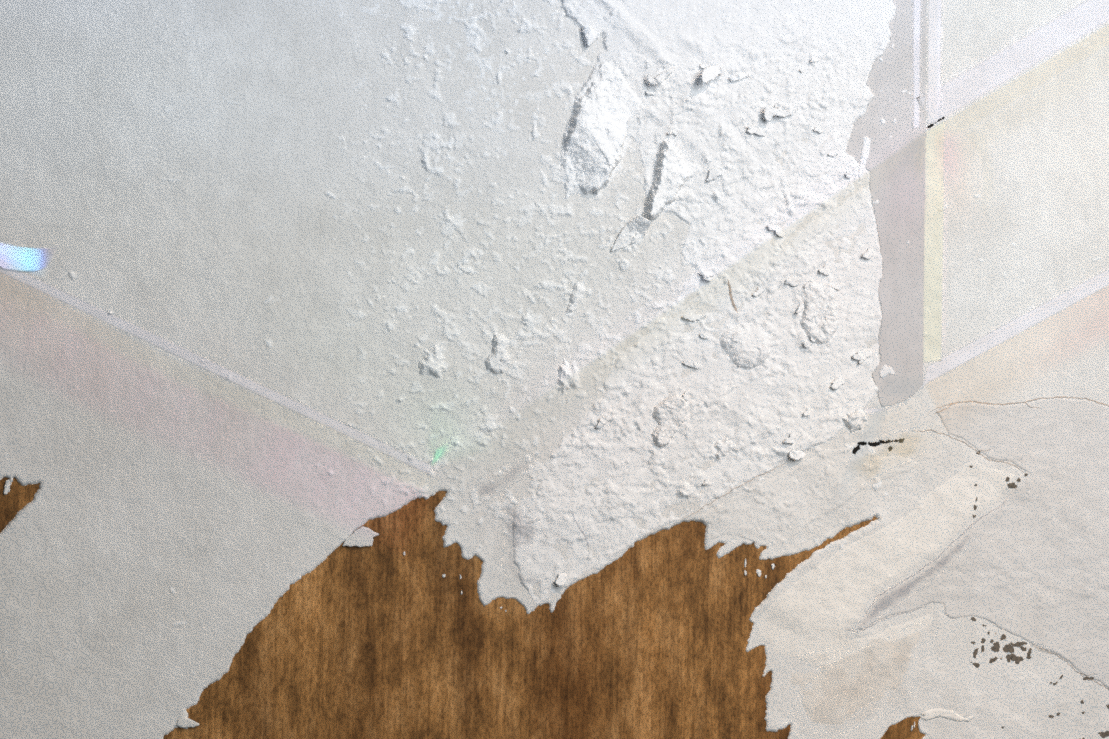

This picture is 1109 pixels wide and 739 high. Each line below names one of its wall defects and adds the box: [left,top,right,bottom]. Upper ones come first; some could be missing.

peeling [163,0,1032,739]
peeling [0,477,40,533]
crack [852,396,1109,632]
crack [1033,645,1109,690]